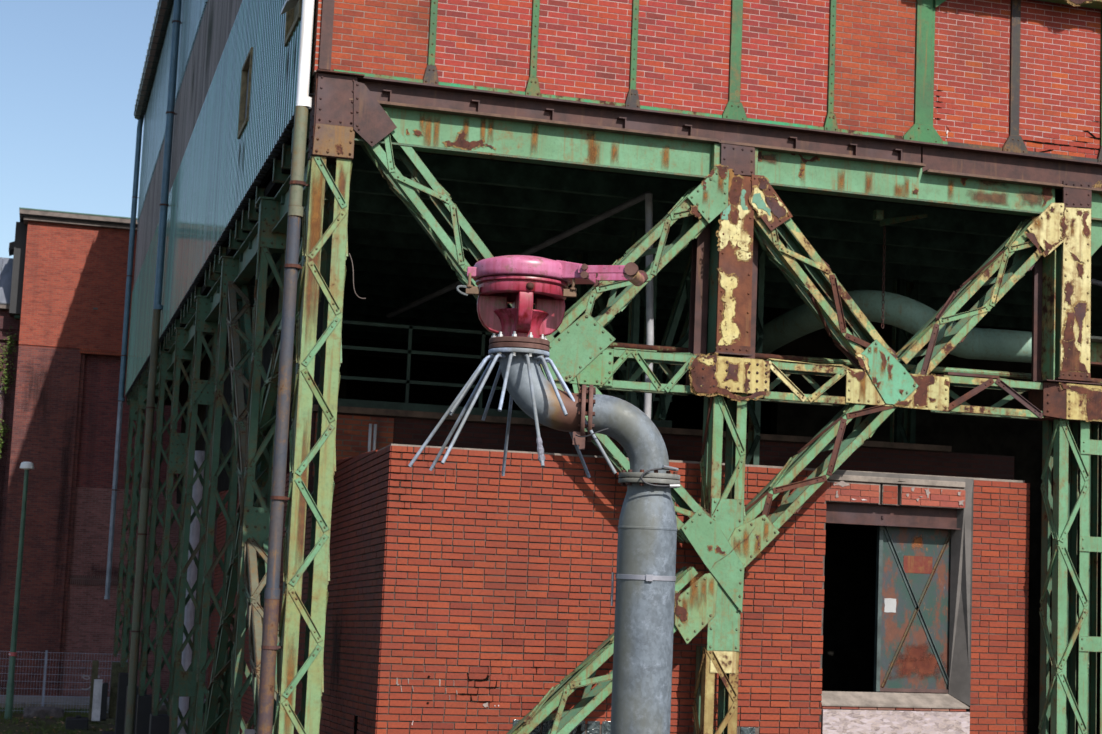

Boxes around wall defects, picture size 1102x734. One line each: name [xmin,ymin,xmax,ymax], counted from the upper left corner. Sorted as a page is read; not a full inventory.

rust [406,116,496,152]
rust [589,133,599,163]
rust [758,151,776,164]
rust [790,153,820,177]
crack [1023,121,1100,152]
peeling [688,169,789,403]
rust [846,348,893,398]
rust [894,374,951,409]
rust [674,524,768,624]
rust [894,644,947,677]